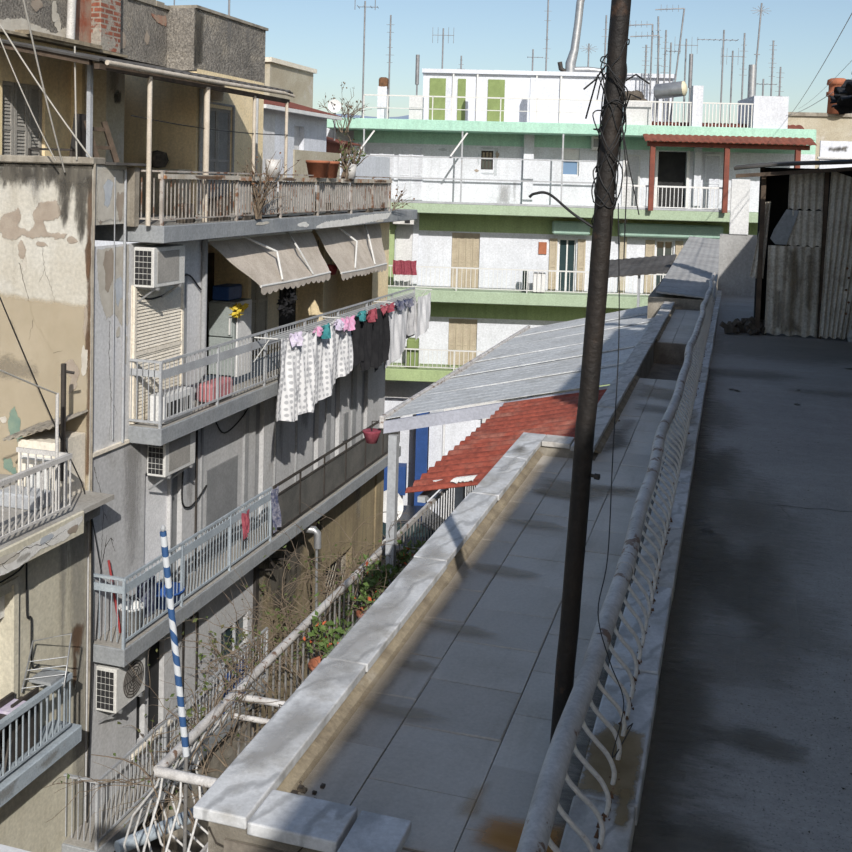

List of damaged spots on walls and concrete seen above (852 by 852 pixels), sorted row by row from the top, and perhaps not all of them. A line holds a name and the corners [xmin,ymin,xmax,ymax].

flaking render [0,0,92,43]
peeling [0,200,78,271]
leakage [0,163,92,240]
leakage [555,406,770,852]
corrosion [479,820,524,852]
corrosion [594,772,620,850]